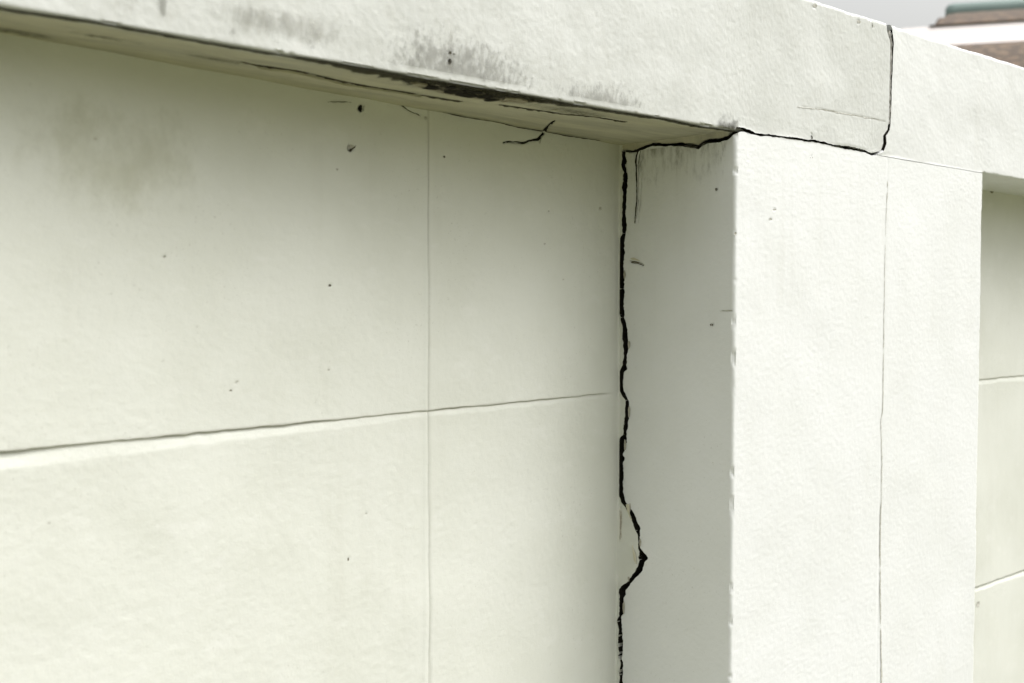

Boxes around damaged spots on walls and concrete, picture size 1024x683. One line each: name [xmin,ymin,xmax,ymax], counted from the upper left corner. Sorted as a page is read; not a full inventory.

crack [447,30,894,683]